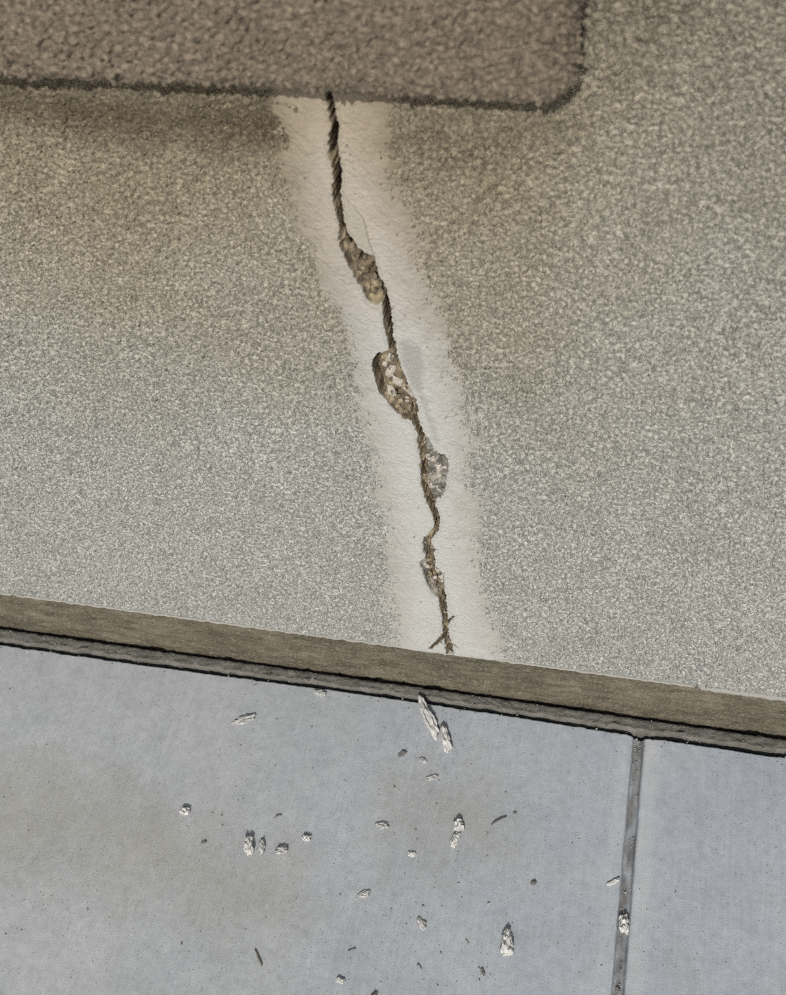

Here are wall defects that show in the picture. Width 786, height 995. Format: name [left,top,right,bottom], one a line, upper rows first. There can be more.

spalling [334,196,386,310]
crack [321,92,460,656]
spalling [369,341,422,423]
spalling [412,434,452,507]
spalling [416,534,448,600]